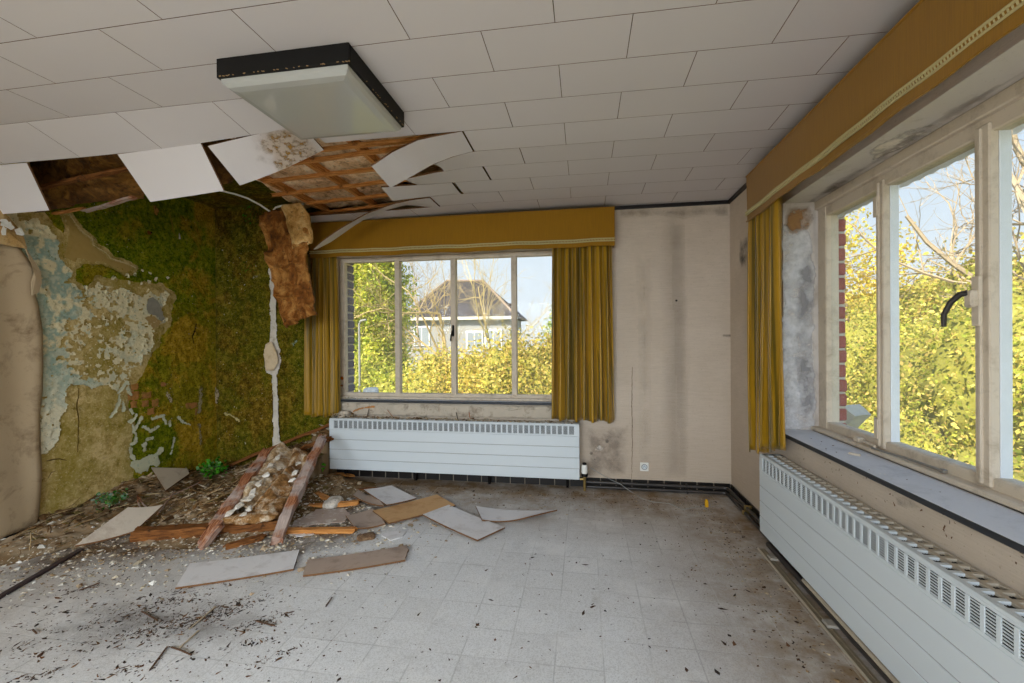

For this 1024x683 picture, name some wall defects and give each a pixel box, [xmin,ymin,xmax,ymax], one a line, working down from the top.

water stain [262,132,317,168]
peeling [7,213,197,474]
peeling [782,225,816,429]